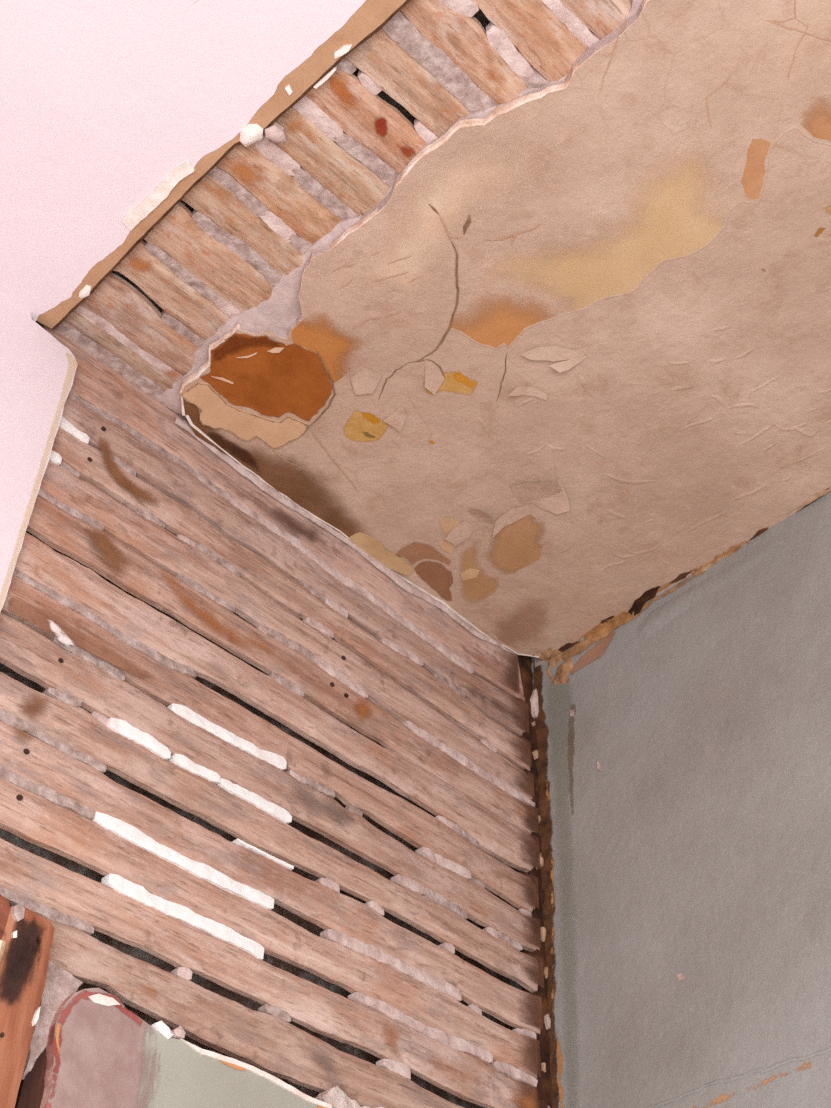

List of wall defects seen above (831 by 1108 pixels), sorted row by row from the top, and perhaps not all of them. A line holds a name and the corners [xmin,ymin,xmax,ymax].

crack [597,13,627,98]
crack [767,0,831,83]
spalling [78,285,91,299]
spalling [122,159,195,231]
spalling [154,0,650,685]
damp [375,170,494,283]
crack [378,203,541,401]
damp [512,165,723,310]
peeling [450,108,831,373]
crack [516,486,831,1108]
spalling [46,991,384,1108]